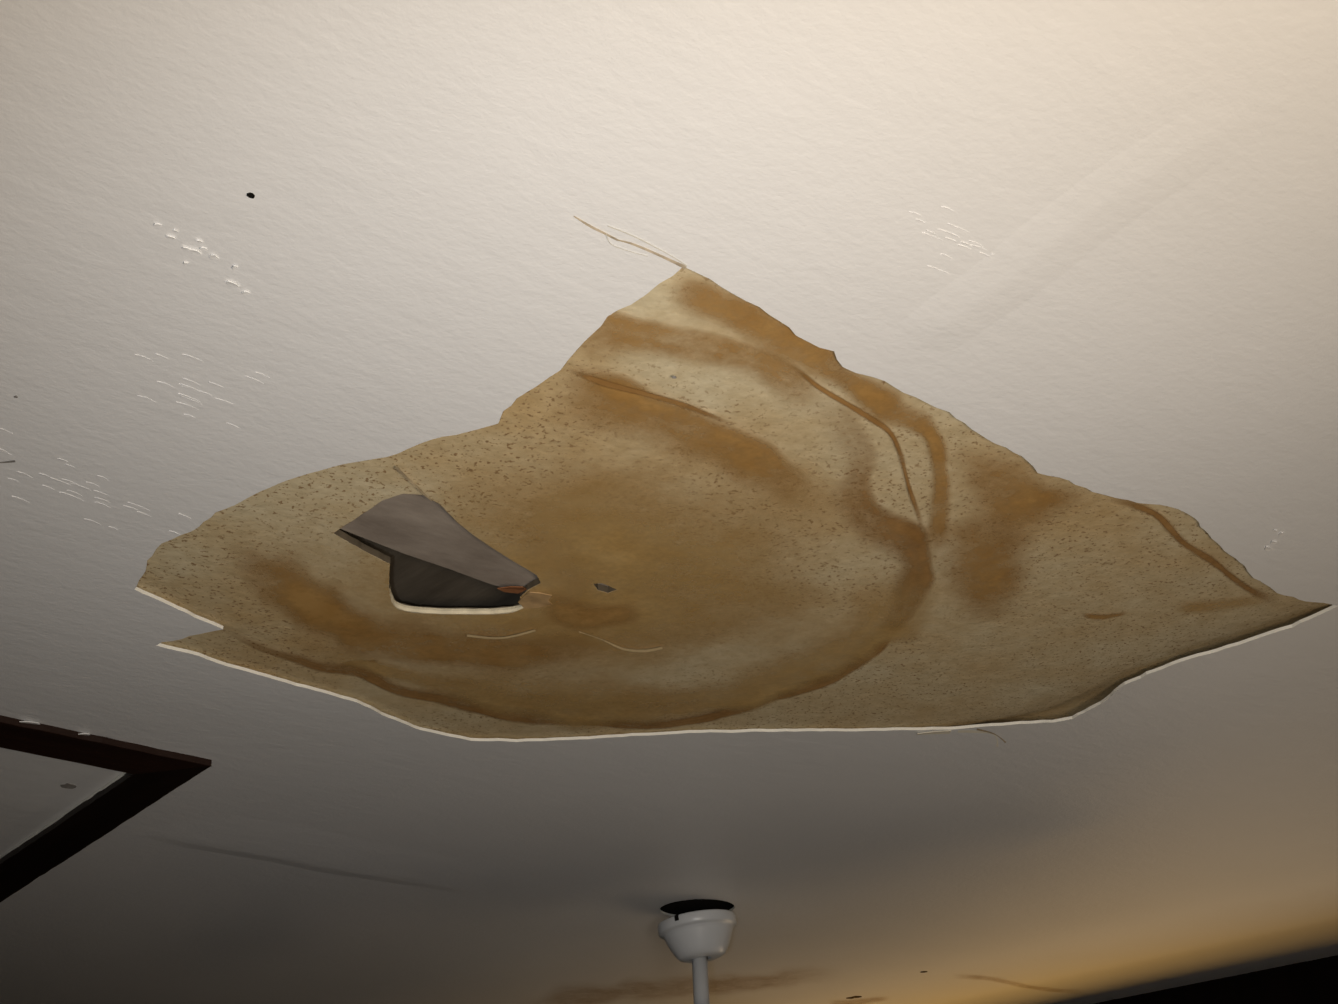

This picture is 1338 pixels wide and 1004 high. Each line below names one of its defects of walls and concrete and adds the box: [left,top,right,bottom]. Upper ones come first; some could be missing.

crack [574,216,687,269]
peeling [8,458,151,517]
leakage [260,286,948,729]
peeling [135,268,1332,739]
leakage [1130,503,1261,611]